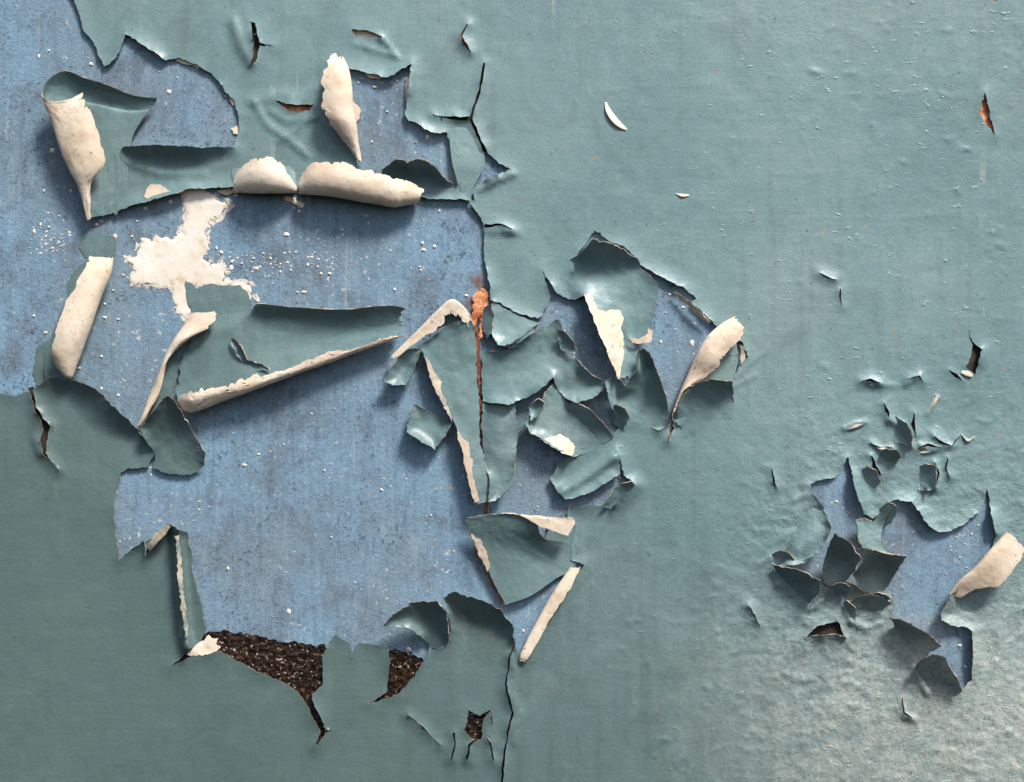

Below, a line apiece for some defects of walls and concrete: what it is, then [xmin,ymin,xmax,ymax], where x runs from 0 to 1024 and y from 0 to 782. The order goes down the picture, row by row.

crack [484,222,512,230]
peeling [0,0,748,745]
corrosion [469,276,490,443]
peeling [961,334,982,377]
peeling [771,416,1024,702]
crack [409,642,514,782]